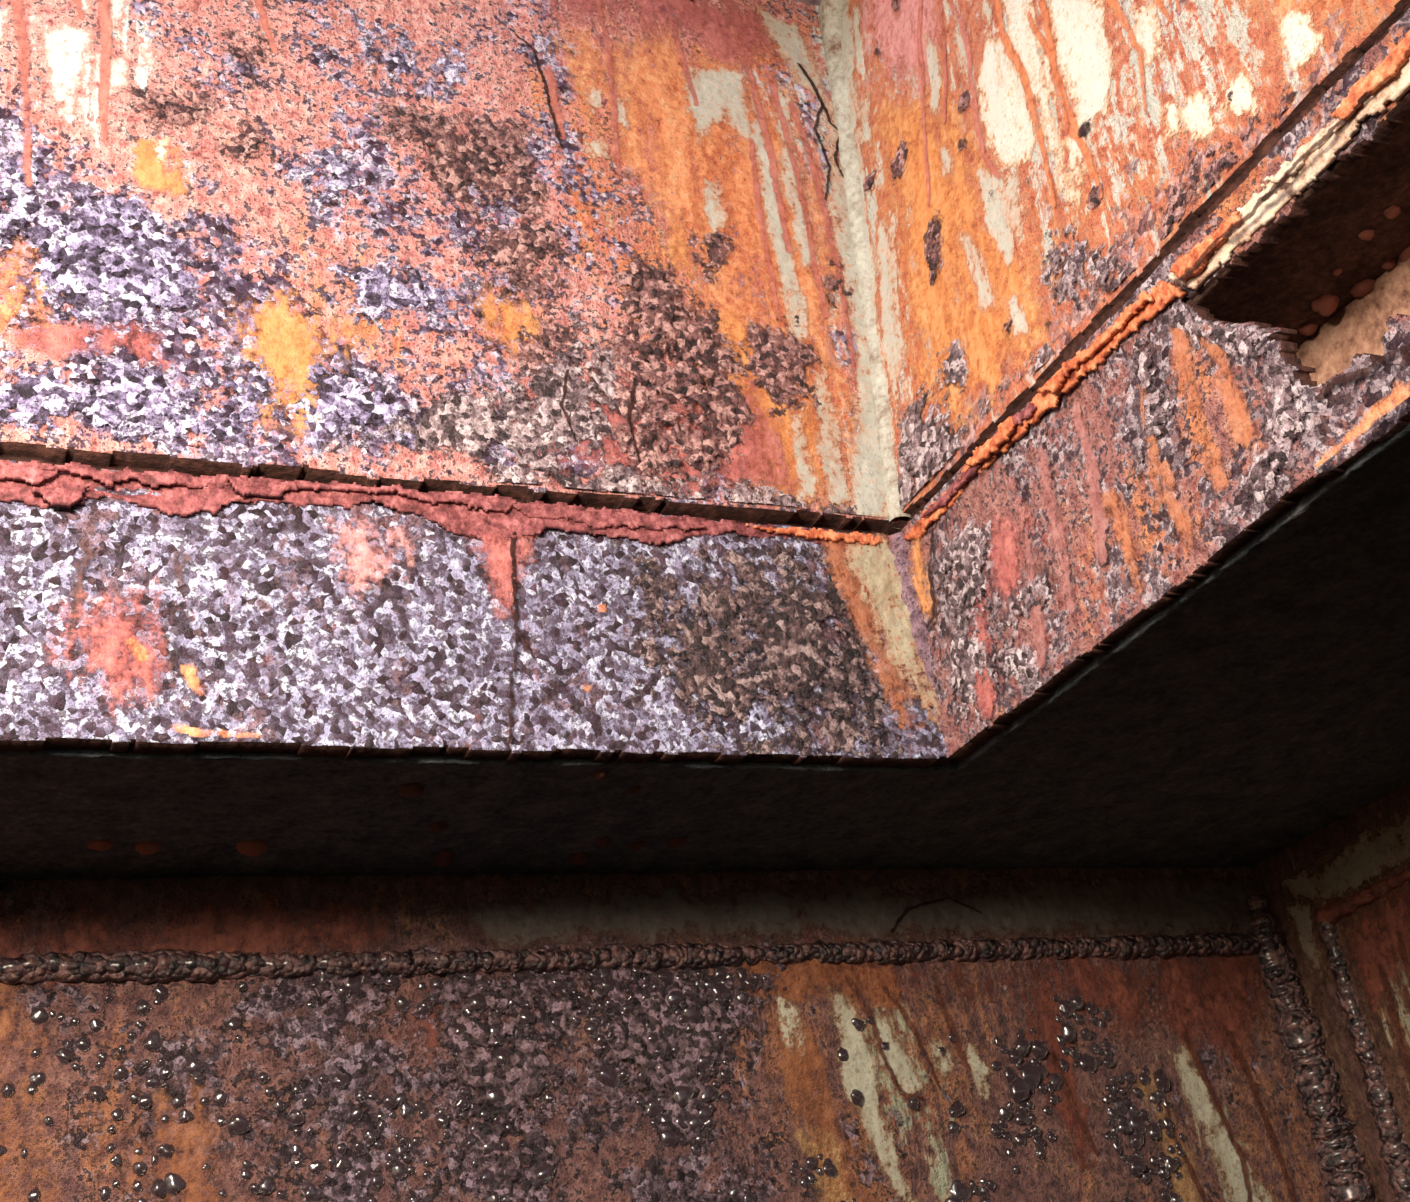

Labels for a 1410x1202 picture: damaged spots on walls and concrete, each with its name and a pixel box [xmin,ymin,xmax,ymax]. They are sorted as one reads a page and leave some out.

crack [797,63,844,200]
peeling [953,0,1166,339]
peeling [1159,71,1258,144]
crack [1173,90,1371,288]
peeling [1278,7,1324,71]
crack [559,369,578,442]
crack [626,378,641,462]
corrosion [0,0,1410,728]
corrosion [175,724,259,738]
corrosion [0,891,1296,1202]
peeling [827,986,995,1202]
peeling [1167,1045,1276,1202]